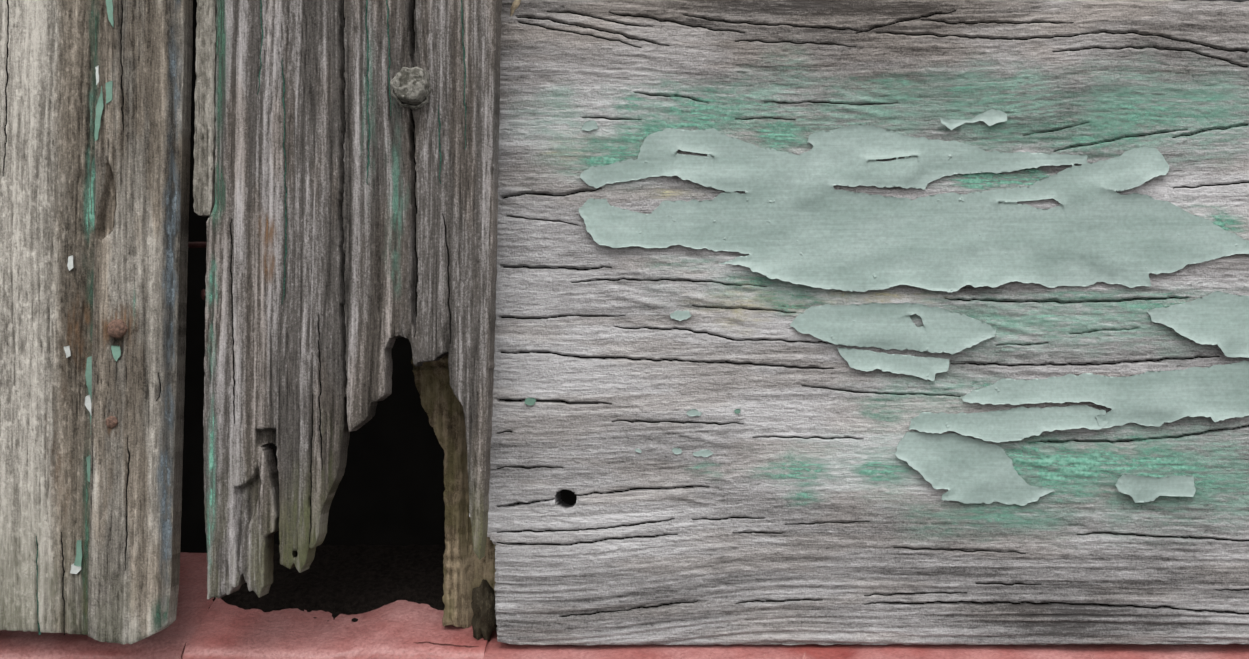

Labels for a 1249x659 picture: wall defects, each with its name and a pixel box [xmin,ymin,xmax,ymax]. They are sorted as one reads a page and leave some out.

crack [518,10,1248,68]
crack [2,0,10,176]
crack [582,92,708,120]
crack [736,101,898,120]
crack [1023,122,1248,151]
peeling [579,109,1249,381]
peeling [895,291,1249,506]
peeling [672,448,713,458]